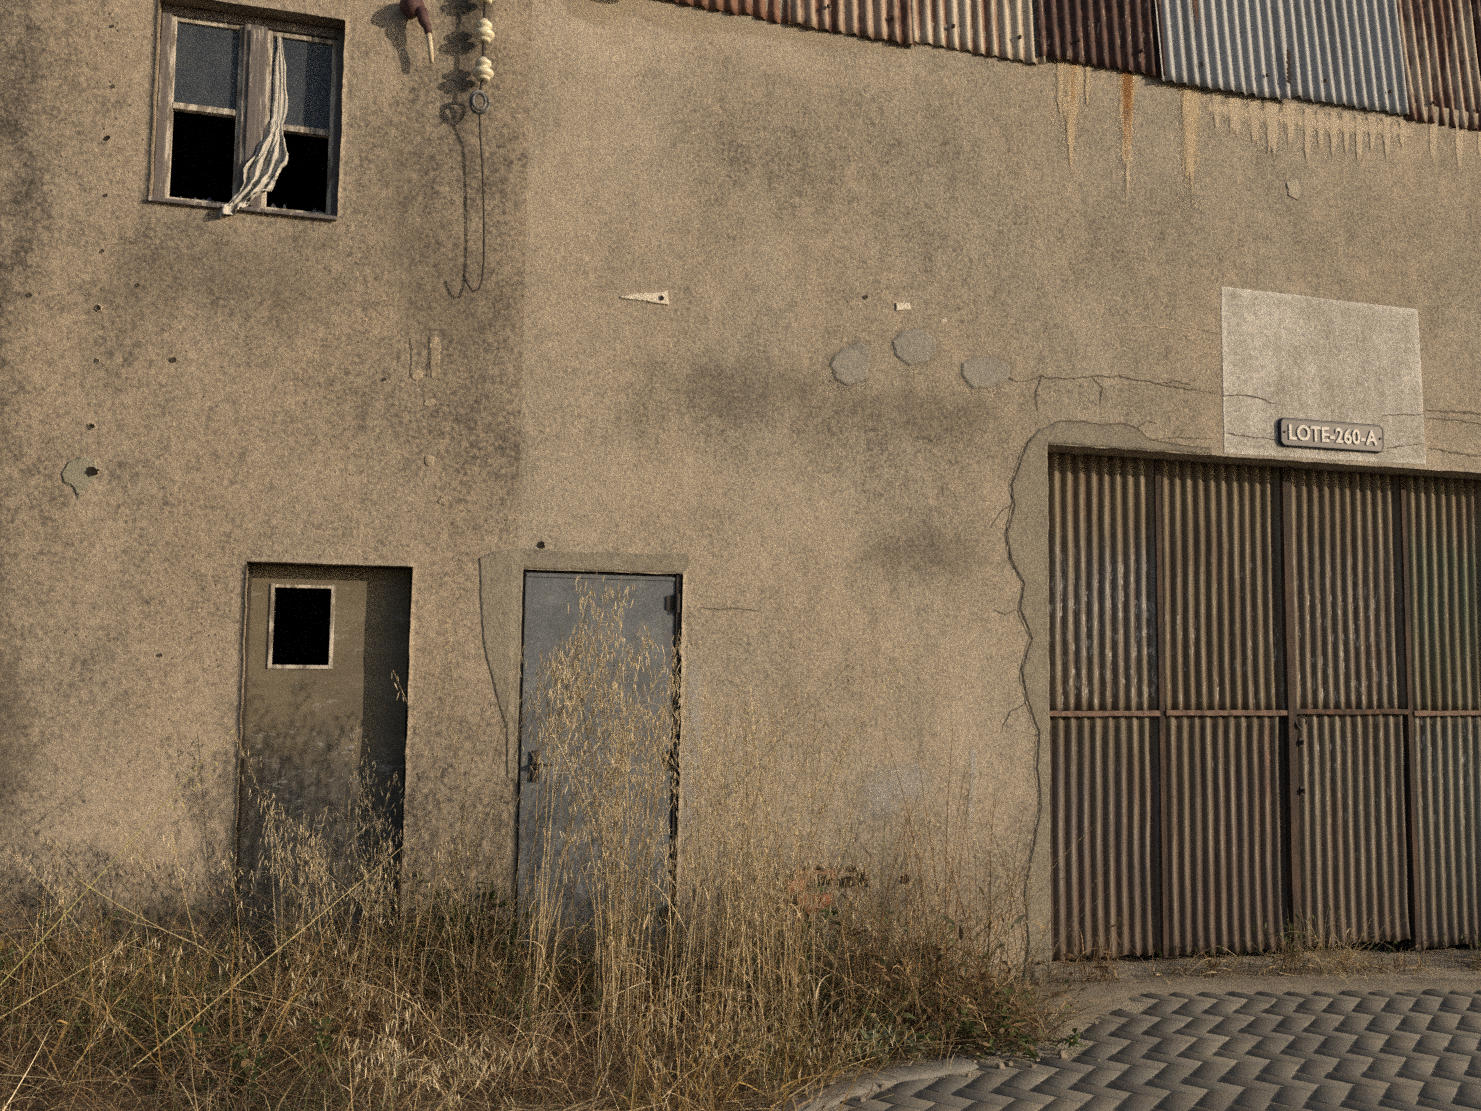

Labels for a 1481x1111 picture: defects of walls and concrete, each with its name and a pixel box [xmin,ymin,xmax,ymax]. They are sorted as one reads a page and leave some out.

corrosion [1057,59,1091,168]
corrosion [1118,68,1137,194]
corrosion [1179,82,1200,188]
crack [1384,409,1481,457]